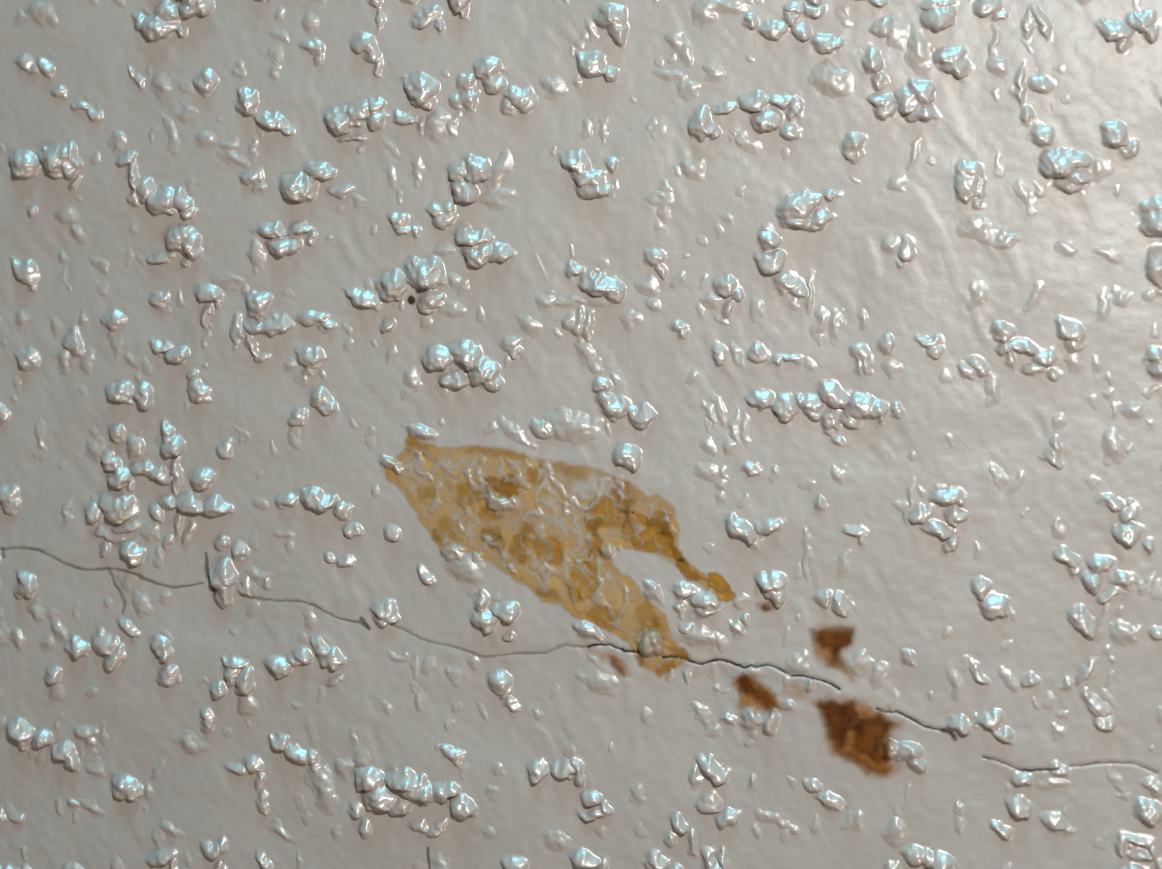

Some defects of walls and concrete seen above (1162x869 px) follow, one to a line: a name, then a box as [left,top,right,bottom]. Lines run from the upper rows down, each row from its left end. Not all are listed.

crack [74,566,150,581]
crack [192,555,215,594]
damp [386,435,735,675]
crack [354,617,370,630]
corrosion [815,628,851,665]
crack [587,643,840,690]
corrosion [736,676,776,709]
corrosion [815,701,895,775]
crack [876,708,956,741]
crack [983,756,1157,773]